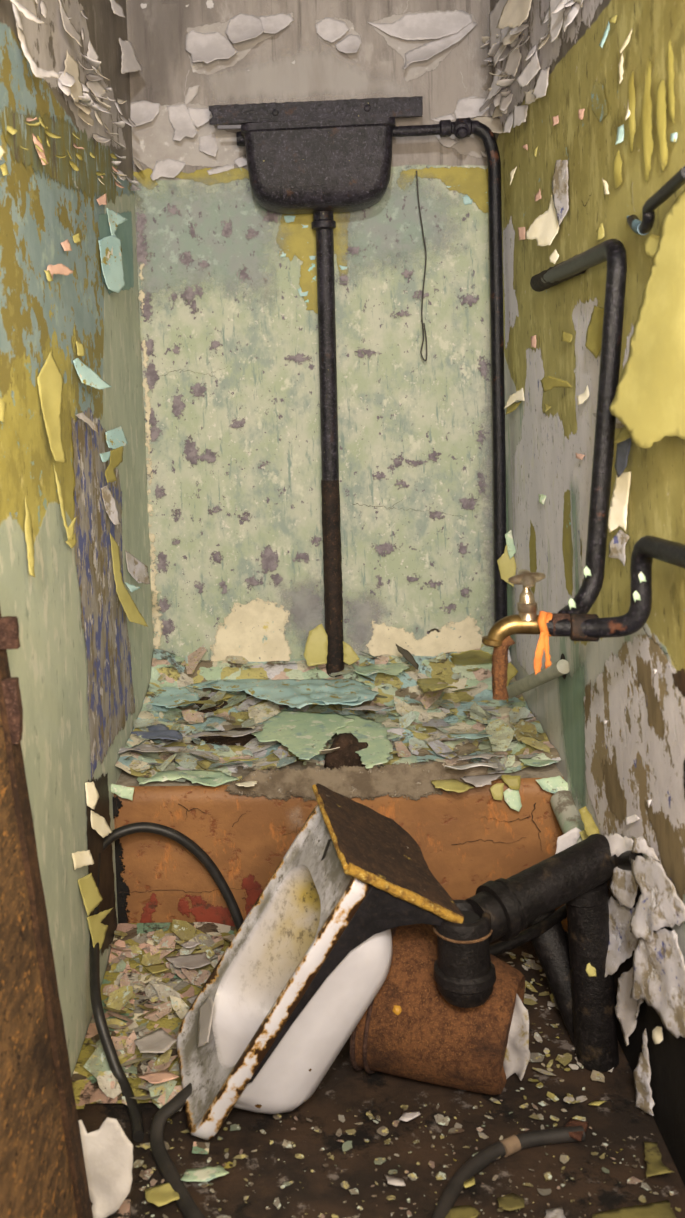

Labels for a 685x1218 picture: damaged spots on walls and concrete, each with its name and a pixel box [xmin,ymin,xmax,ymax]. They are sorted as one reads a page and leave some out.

peeling [315,0,617,213]
peeling [615,98,630,145]
peeling [618,29,632,84]
peeling [503,159,569,349]
peeling [0,0,294,954]
peeling [194,535,323,662]
flaking render [284,353,312,365]
flaking render [354,347,382,359]
peeling [348,425,495,657]
peeling [516,634,545,675]
peeling [488,190,685,615]
peeling [583,633,685,1116]